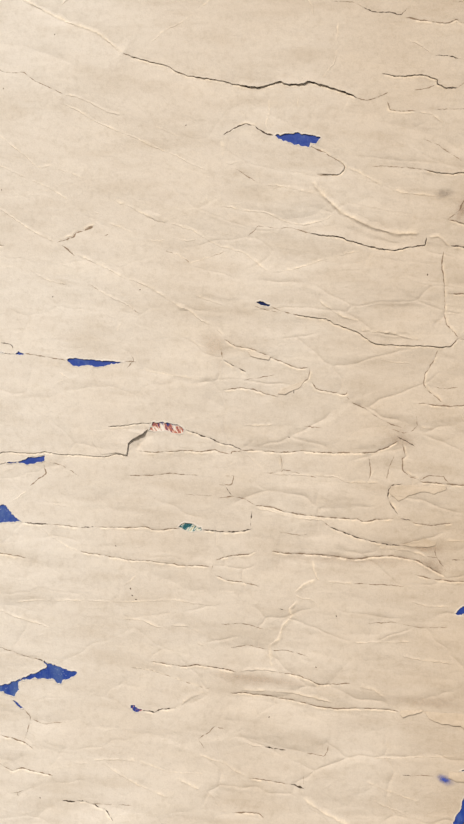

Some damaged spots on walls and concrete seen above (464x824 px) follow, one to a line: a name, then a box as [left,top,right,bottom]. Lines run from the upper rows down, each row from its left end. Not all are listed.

crack [343,1,464,27]
crack [57,222,108,254]
crack [441,201,464,342]
crack [81,340,464,588]
crack [22,522,180,534]
crack [224,623,308,657]
crack [152,661,235,674]
crack [279,672,349,688]
crack [143,708,175,716]
crack [0,712,62,795]
crack [250,777,304,789]
crack [62,800,130,822]